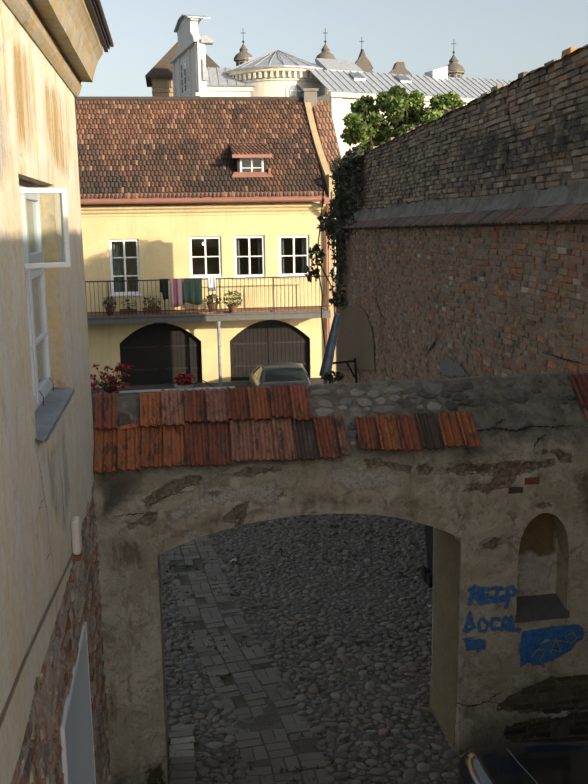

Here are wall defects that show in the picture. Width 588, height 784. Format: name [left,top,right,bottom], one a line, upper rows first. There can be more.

leakage [15,50,30,136]
leakage [46,92,67,165]
crack [471,419,573,450]
spalling [446,448,575,495]
spalling [126,475,204,530]